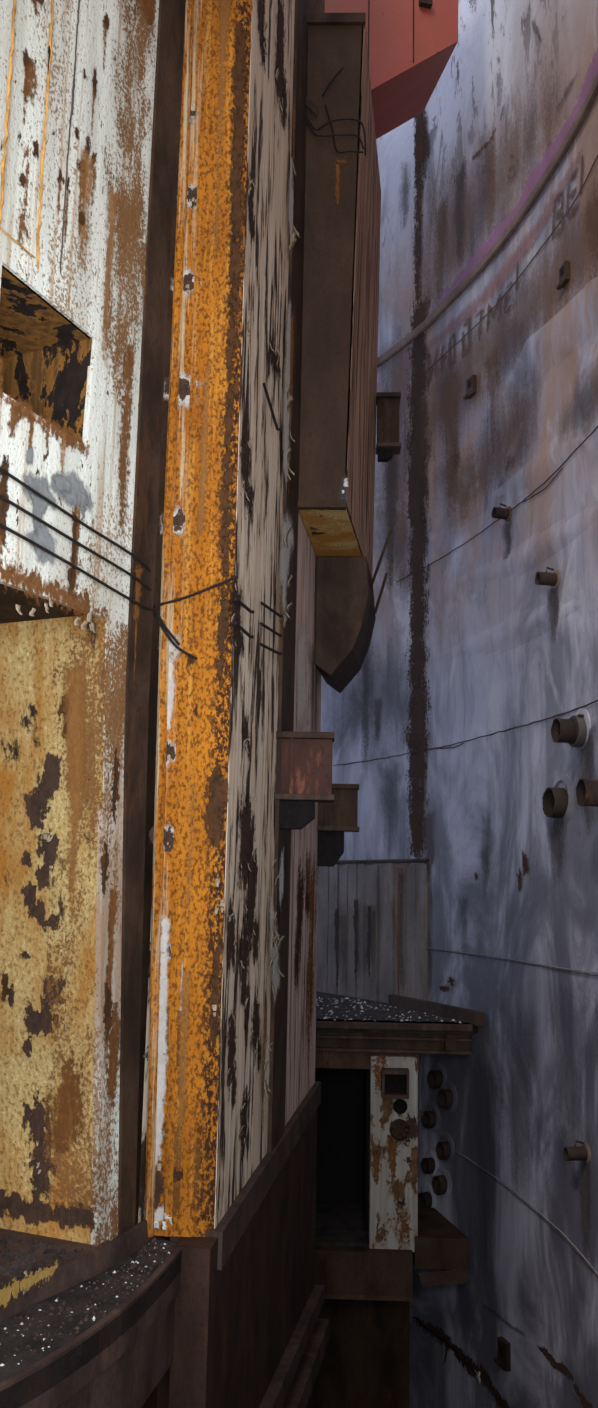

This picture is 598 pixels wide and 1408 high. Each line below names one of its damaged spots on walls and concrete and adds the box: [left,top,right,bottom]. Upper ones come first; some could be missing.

corrosion [21,47,38,124]
corrosion [15,140,39,250]
corrosion [57,0,158,533]
corrosion [197,0,252,692]
corrosion [0,390,90,473]
water stain [383,110,598,994]
corrosion [0,454,143,1248]
corrosion [186,760,229,909]
corrosion [208,933,222,1048]
water stain [334,898,374,989]
corrosion [158,972,208,1219]
corrosion [370,1110,423,1246]